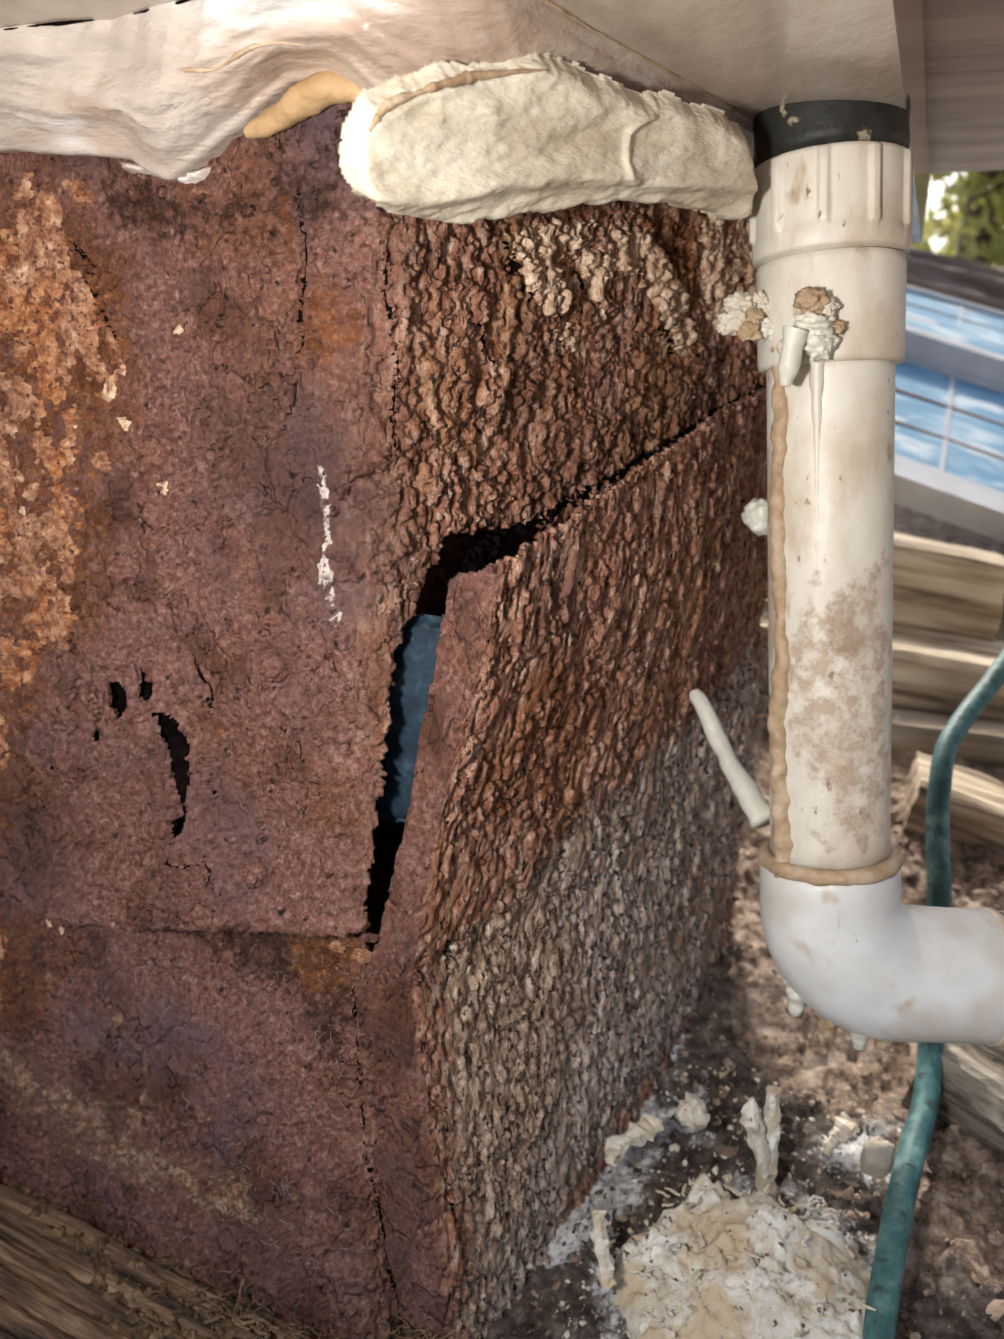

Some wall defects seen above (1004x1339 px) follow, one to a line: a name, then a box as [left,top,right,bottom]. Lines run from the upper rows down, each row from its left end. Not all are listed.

crack [462,381,766,573]
crack [538,688,559,728]
crack [442,1095,450,1133]
crack [351,985,404,1335]
crack [447,1176,458,1218]